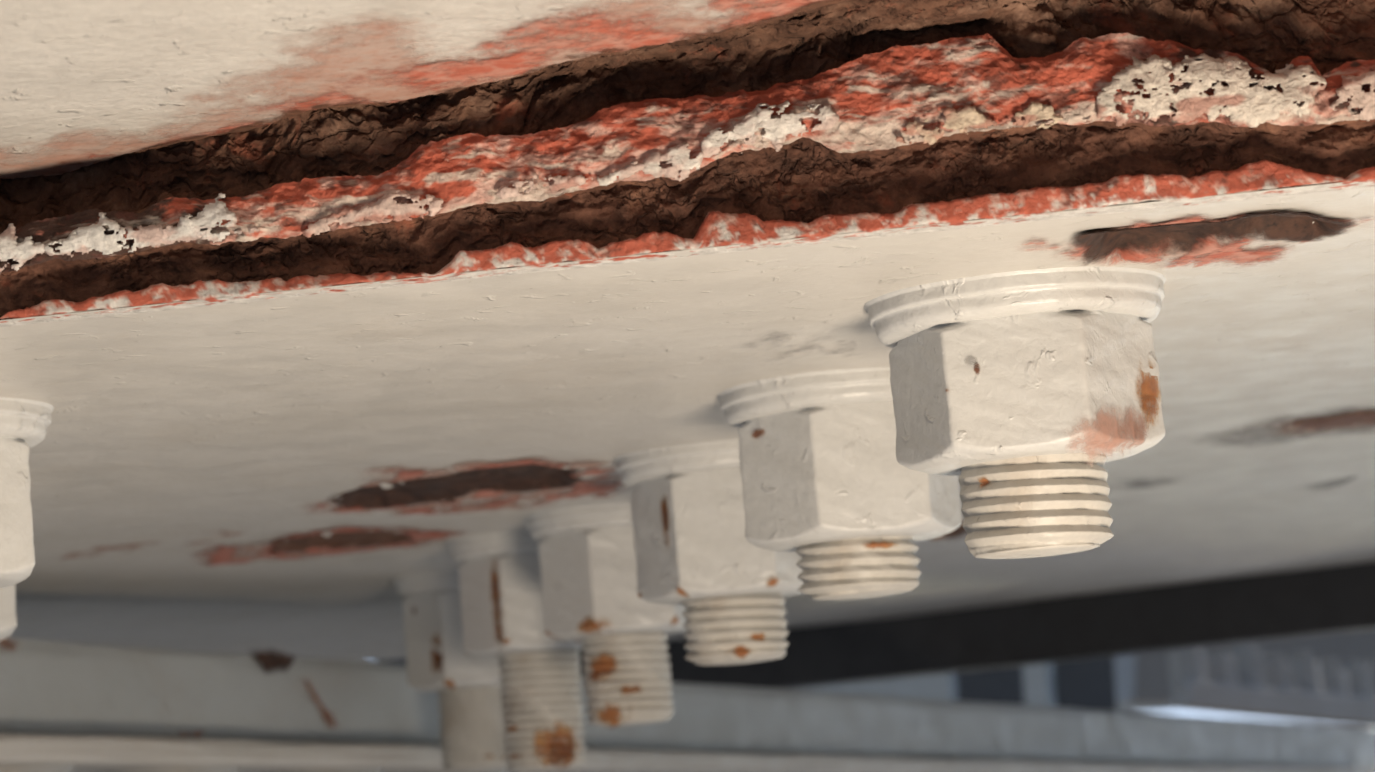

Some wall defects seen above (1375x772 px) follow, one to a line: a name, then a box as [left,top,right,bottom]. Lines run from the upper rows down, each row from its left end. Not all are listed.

corrosion [0,0,848,180]
peeling [0,33,1375,272]
corrosion [0,119,1375,318]
peeling [0,160,1375,327]
corrosion [1071,367,1160,458]
corrosion [511,722,575,766]
corrosion [578,617,607,633]
corrosion [589,653,616,681]
corrosion [598,685,641,727]